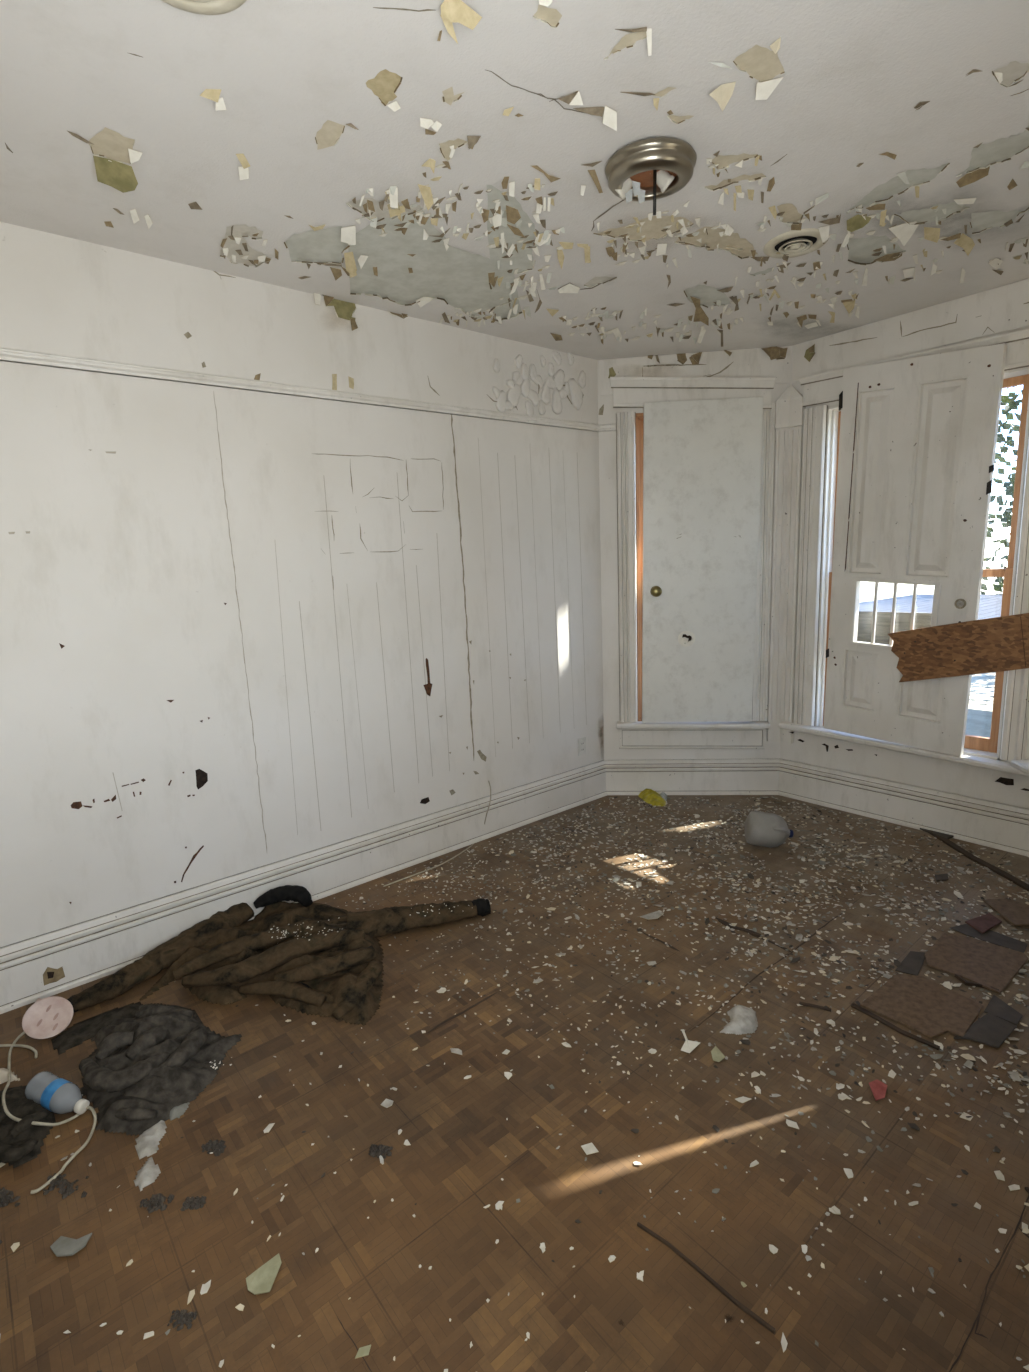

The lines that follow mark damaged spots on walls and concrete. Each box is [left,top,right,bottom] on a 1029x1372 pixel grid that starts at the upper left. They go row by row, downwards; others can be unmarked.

peeling [366,69,403,112]
peeling [442,87,464,105]
crack [486,70,602,117]
peeling [557,91,617,131]
peeling [621,87,693,125]
peeling [965,61,1029,96]
peeling [68,127,142,193]
peeling [104,208,153,229]
peeling [220,118,1029,364]
crack [428,378,474,759]